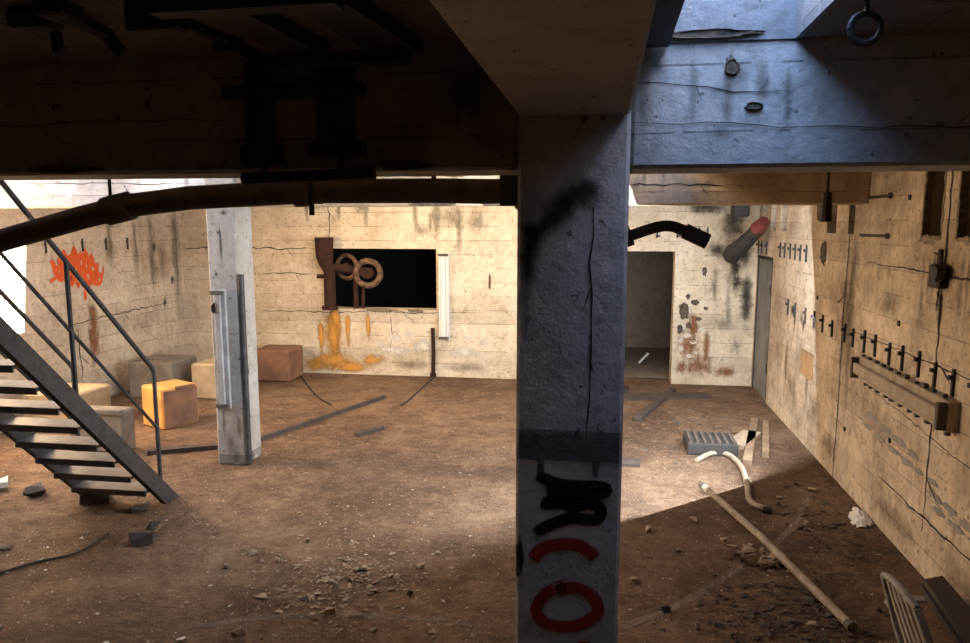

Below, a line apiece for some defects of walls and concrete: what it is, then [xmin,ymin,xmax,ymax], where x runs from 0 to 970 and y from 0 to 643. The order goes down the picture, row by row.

corrosion [305,310,384,372]
spalling [677,294,708,358]
crack [832,171,970,476]
crack [874,393,970,561]